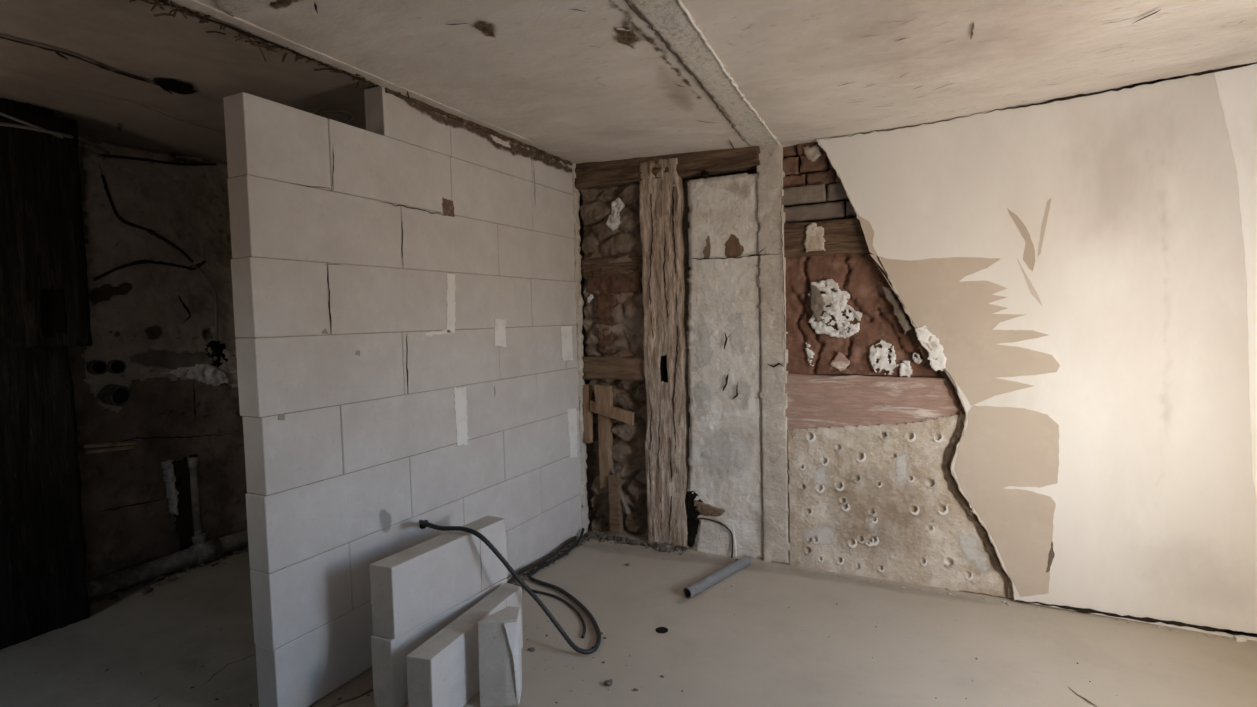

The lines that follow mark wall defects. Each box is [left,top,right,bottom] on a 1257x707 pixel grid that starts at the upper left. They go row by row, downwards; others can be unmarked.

peeling [821,146,1059,598]
spalling [801,453,866,511]
spalling [805,510,879,570]